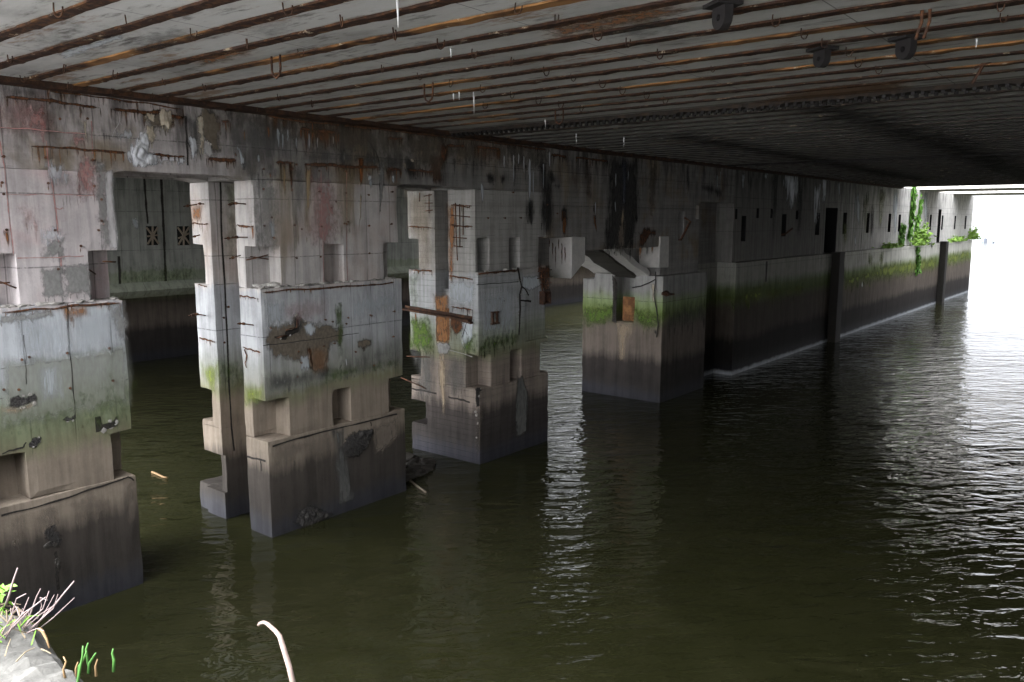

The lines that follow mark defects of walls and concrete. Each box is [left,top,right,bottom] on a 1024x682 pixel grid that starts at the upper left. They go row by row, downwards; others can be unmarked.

corrosion [6,90,184,127]
corrosion [32,146,125,167]
leakage [117,108,204,167]
corrosion [270,127,447,218]
leakage [593,156,639,256]
corrosion [448,204,473,280]
peeling [266,314,343,372]
corrosion [435,296,473,343]
spalling [10,393,37,409]
spalling [95,416,119,434]
spalling [343,420,397,458]